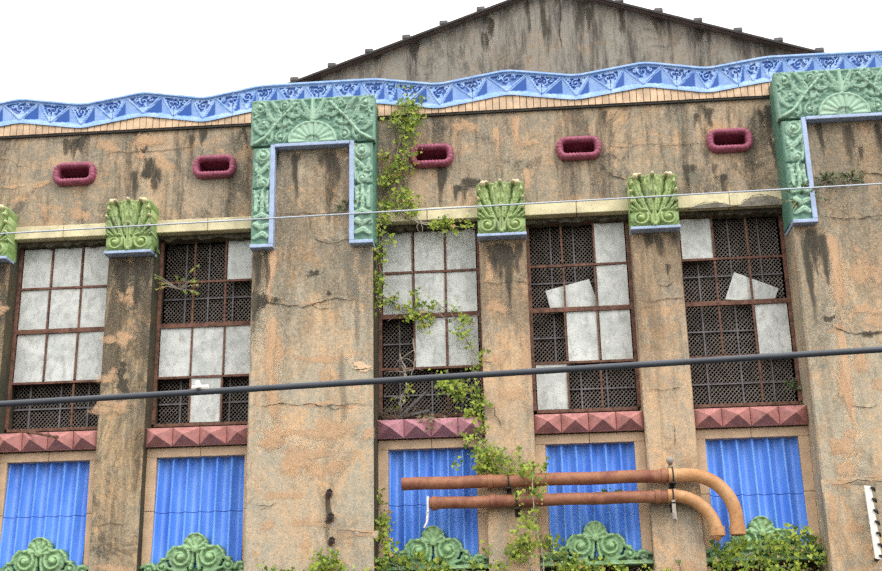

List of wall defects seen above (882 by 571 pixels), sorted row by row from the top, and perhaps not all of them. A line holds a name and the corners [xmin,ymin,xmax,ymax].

leakage [525,0,547,36]
leakage [481,17,494,47]
crack [256,298,361,309]
crack [820,316,882,337]
crack [260,401,369,410]